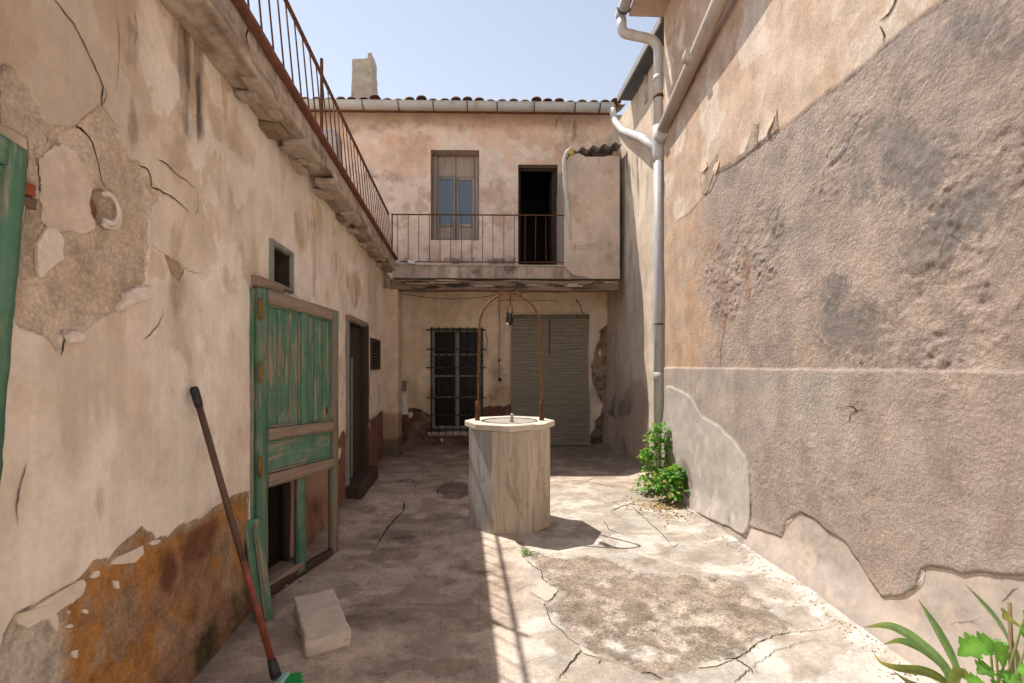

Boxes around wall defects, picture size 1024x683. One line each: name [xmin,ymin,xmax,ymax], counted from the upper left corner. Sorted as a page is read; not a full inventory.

crack [55,0,138,124]
flaking render [0,64,163,351]
crack [138,160,199,214]
peeling [701,111,778,194]
flaking render [589,325,607,445]
crack [16,467,26,521]
crack [342,480,454,554]
peeling [0,491,253,683]
water stain [196,626,217,671]
crack [354,544,662,679]
crack [720,627,830,683]
peeling [743,513,1024,683]